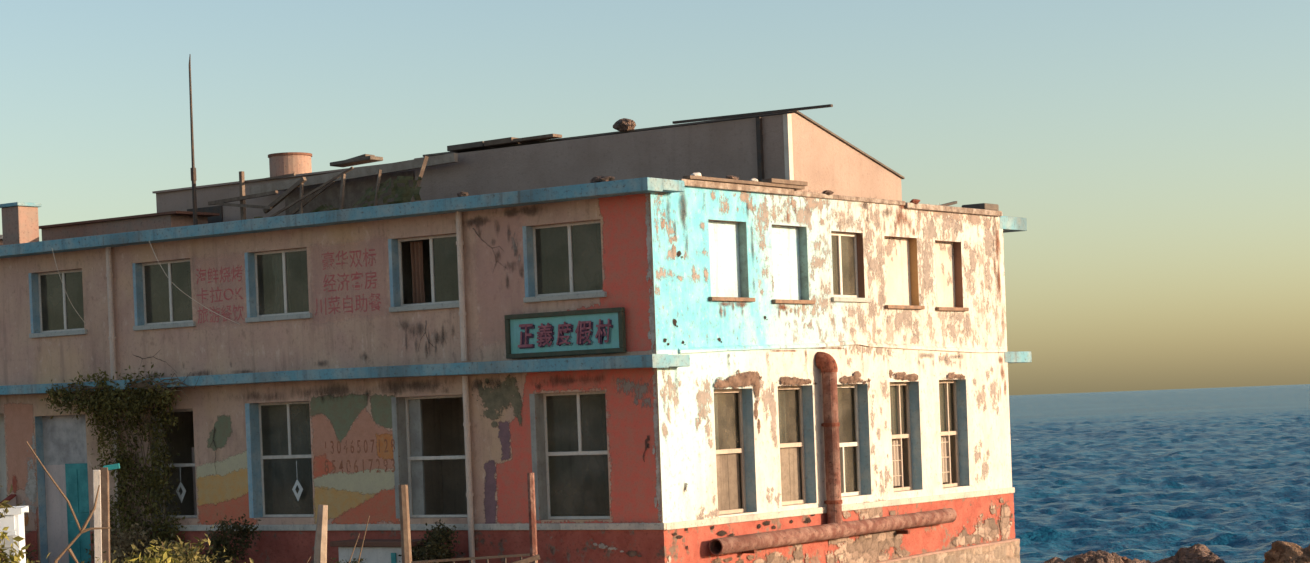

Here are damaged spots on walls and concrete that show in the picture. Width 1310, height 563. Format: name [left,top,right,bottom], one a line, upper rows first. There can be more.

peeling [472,375,522,428]
spalling [616,192,817,521]
spalling [711,189,999,563]
spalling [673,495,735,550]
spalling [951,497,1014,547]